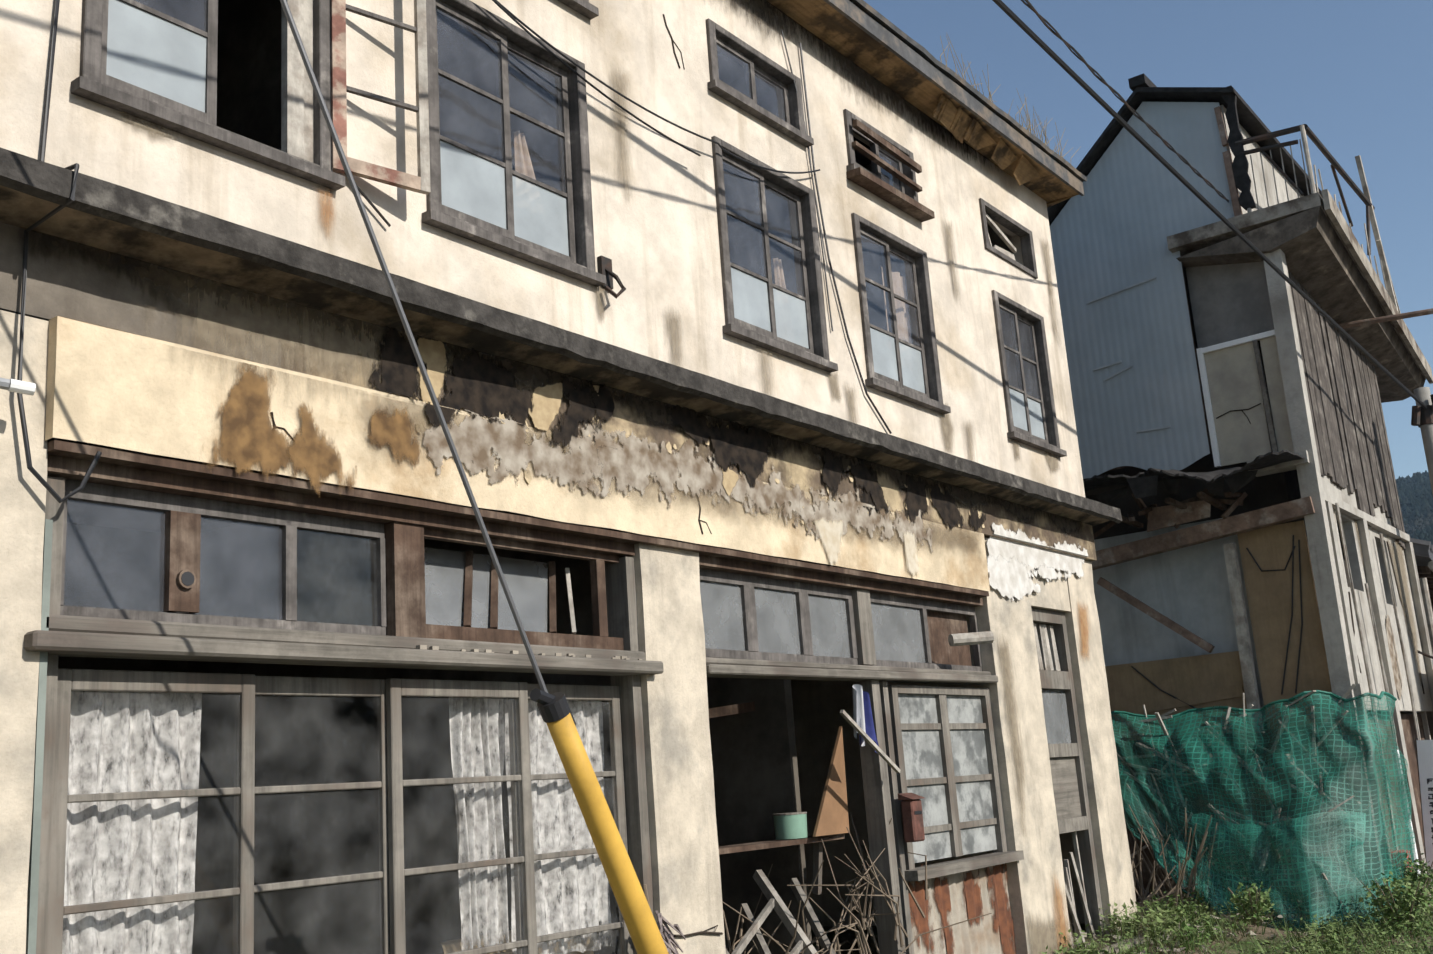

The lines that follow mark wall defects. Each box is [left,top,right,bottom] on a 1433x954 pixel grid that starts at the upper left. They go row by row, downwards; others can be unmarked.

water stain [181,272,409,494]
water stain [368,408,433,467]
water stain [648,472,753,507]
spalling [369,326,1088,601]
water stain [814,505,977,577]
corrosion [908,863,1016,954]